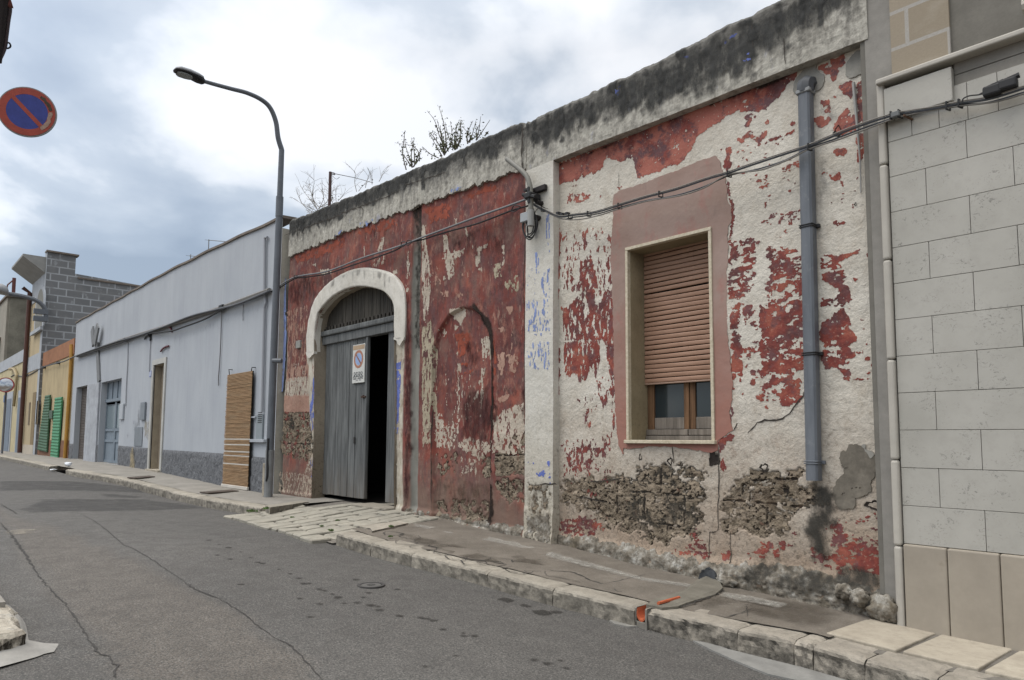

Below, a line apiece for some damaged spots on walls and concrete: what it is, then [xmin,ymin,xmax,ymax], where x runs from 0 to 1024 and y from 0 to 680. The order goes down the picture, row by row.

water stain [289,0,850,235]
peeling [814,54,864,162]
flaking render [279,271,314,498]
flaking render [295,184,731,561]
peeling [559,72,804,409]
crack [734,392,804,433]
peeling [819,249,872,381]
crack [0,504,120,677]
crack [81,514,323,680]
flaking render [720,468,821,560]
water stain [804,485,837,558]
peeling [810,513,879,575]